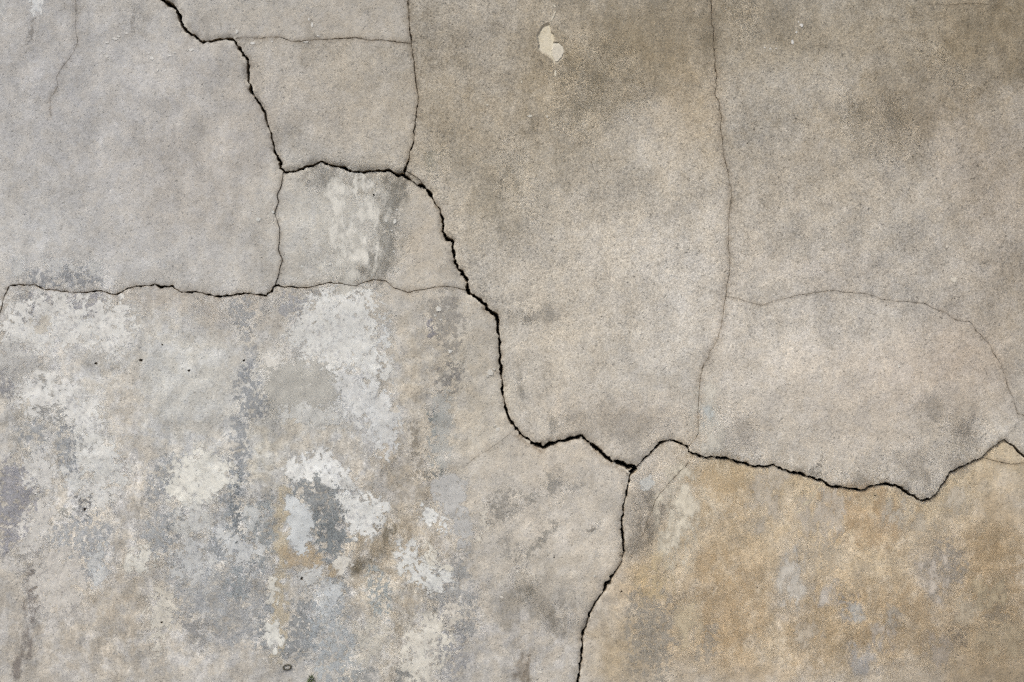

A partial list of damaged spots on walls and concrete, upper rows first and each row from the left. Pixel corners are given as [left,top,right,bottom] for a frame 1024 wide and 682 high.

spalling [536,4,565,77]
crack [711,0,732,196]
crack [0,0,637,682]
crack [699,218,730,389]
crack [953,318,1023,415]
crack [636,428,986,502]
crack [997,439,1024,458]